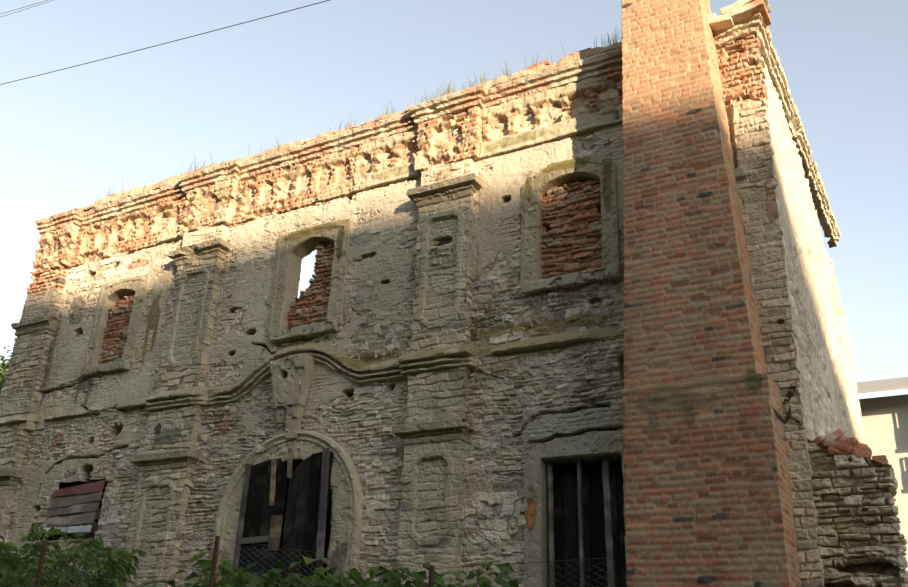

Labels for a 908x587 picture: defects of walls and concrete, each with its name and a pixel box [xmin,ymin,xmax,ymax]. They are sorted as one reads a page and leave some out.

damp [142,296,161,360]